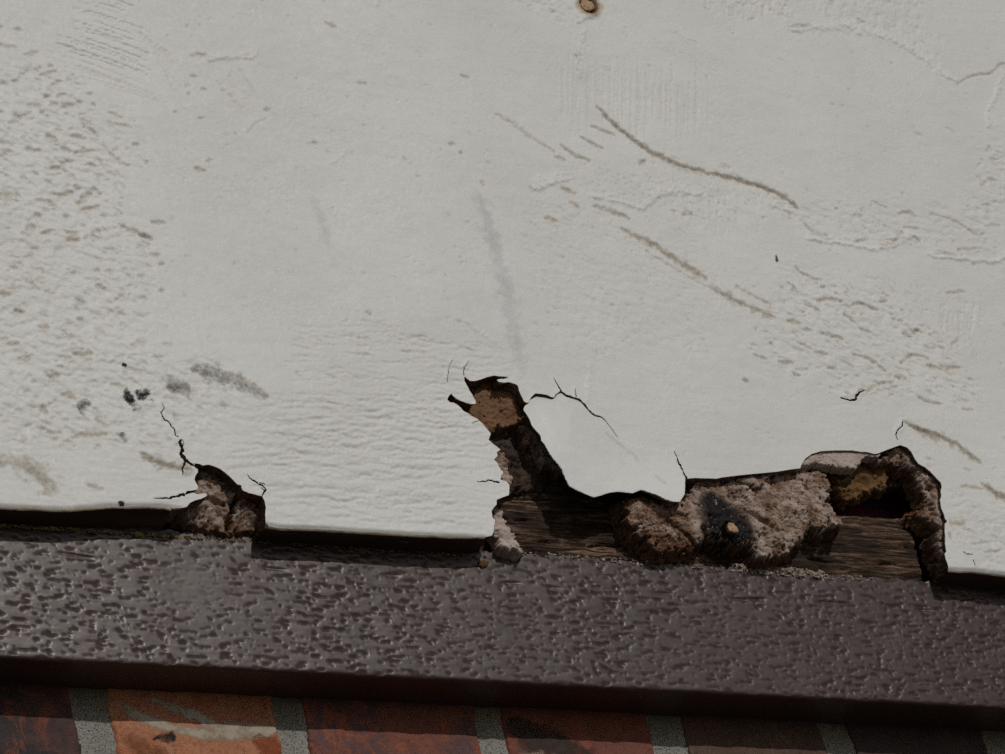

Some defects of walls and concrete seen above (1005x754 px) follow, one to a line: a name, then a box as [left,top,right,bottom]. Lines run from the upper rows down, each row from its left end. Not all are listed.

crack [156,404,198,499]
spalling [165,464,269,540]
crack [530,380,618,437]
spalling [447,376,948,583]